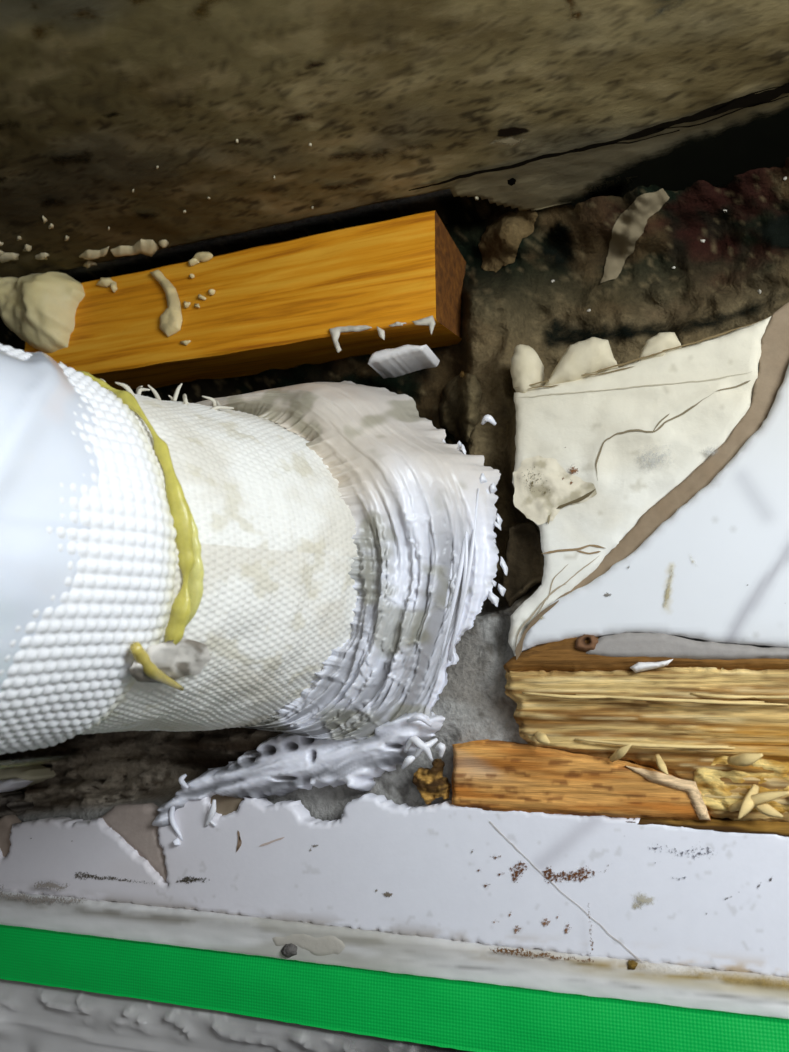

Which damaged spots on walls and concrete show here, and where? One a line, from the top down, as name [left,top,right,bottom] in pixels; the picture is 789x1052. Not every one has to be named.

crack [409,83,789,191]
water stain [560,103,789,209]
water stain [543,222,576,268]
water stain [545,304,764,347]
spalling [488,455,597,607]
spalling [0,815,21,857]
spalling [100,803,167,882]
spalling [211,794,244,816]